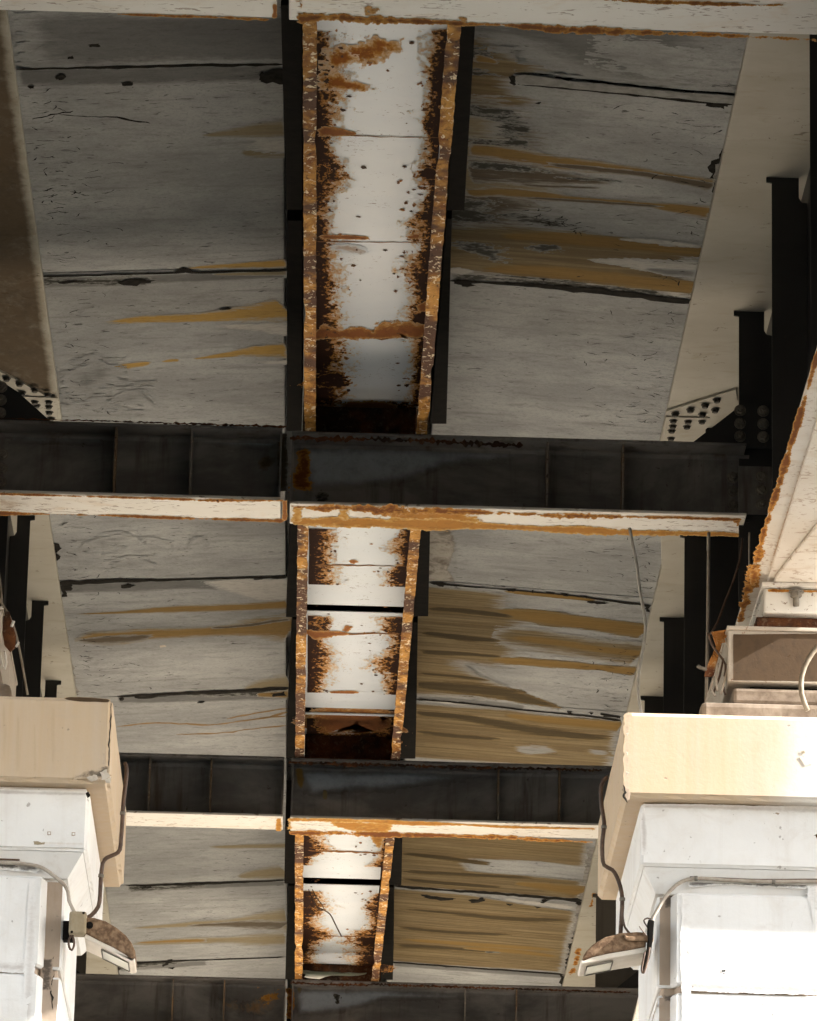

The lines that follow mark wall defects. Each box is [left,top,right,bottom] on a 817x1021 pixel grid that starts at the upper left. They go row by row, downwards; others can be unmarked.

corrosion [202,119,285,159]
corrosion [290,0,816,435]
corrosion [188,259,287,276]
damp [657,291,691,299]
corrosion [106,297,287,365]
corrosion [737,350,817,622]
corrosion [0,434,742,789]
corrosion [132,818,595,1021]
damp [500,898,576,910]